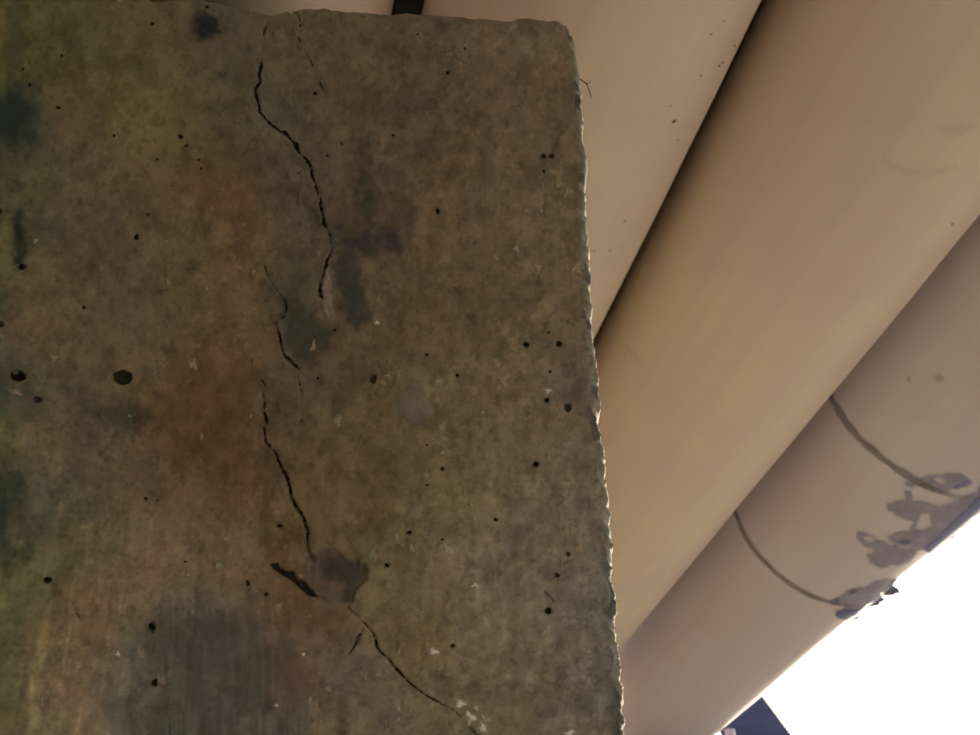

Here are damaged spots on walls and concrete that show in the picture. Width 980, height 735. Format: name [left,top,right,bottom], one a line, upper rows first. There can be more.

crack [254,27,332,298]
crack [265,267,302,393]
crack [251,359,314,558]
peeling [857,474,980,569]
peeling [831,579,900,622]
crack [348,606,478,735]